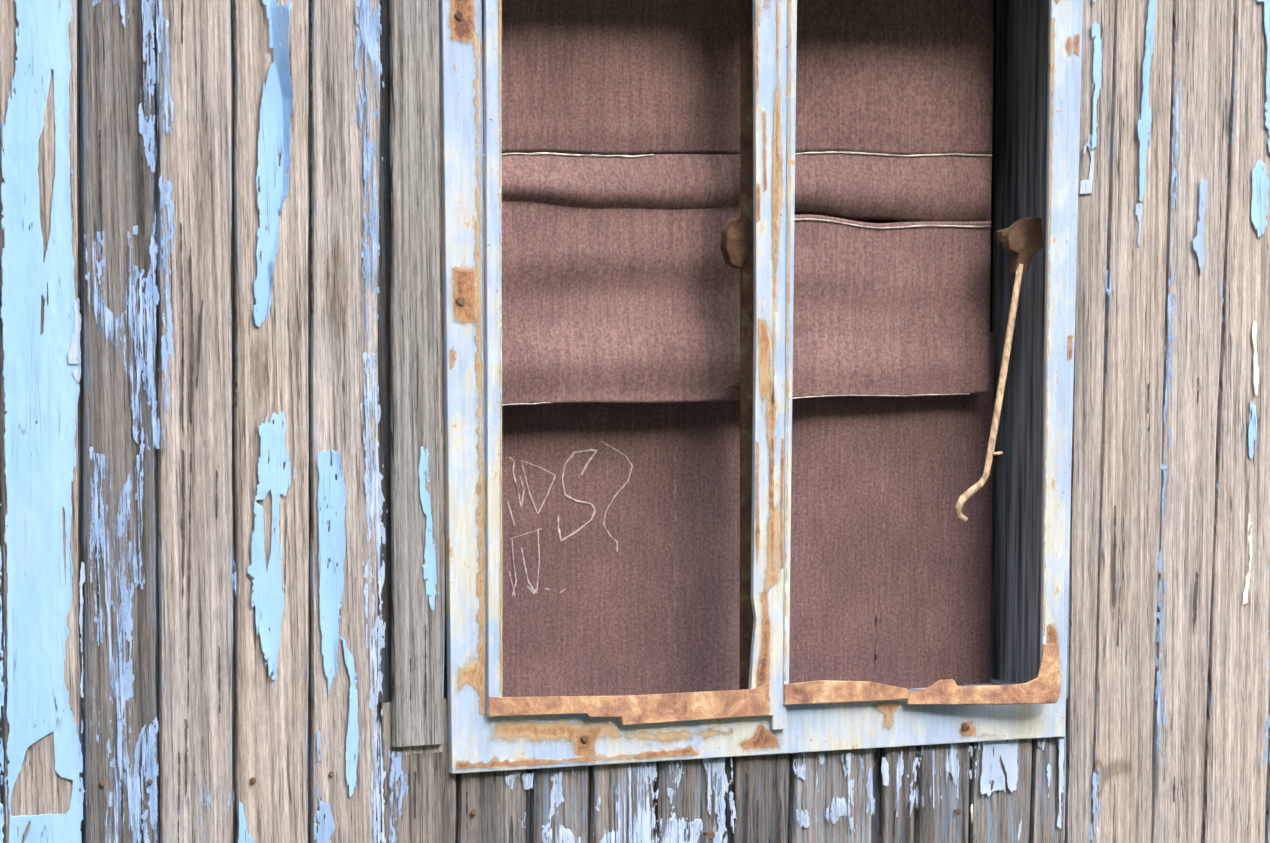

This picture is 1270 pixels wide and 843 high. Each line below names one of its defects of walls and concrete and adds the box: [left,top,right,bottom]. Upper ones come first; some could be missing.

peeling [253,0,293,327]
peeling [1251,0,1270,238]
peeling [0,0,176,843]
peeling [231,411,296,690]
peeling [314,0,409,843]
corrosion [450,0,486,714]
corrosion [755,0,791,708]
corrosion [456,720,778,769]
peeling [542,757,737,843]
corrosion [874,702,899,729]
peeling [793,739,1019,833]
corrosion [960,722,975,736]